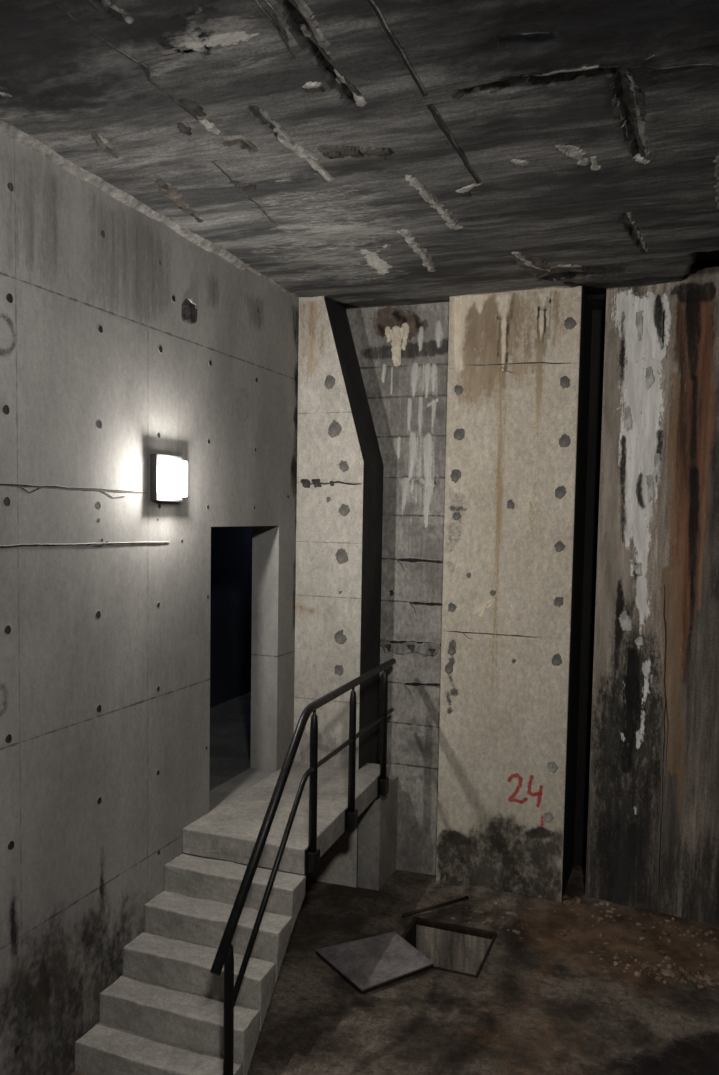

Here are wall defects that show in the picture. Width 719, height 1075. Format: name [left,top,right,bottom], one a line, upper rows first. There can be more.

spalling [276,0,367,107]
crack [212,161,277,225]
spalling [248,105,395,182]
spalling [451,65,651,164]
leakage [364,292,560,527]
crack [0,483,146,499]
crack [0,540,169,549]
peeling [611,288,671,749]
rust [661,282,716,805]
leakage [586,295,719,926]
leakage [447,640,458,713]
leakage [437,817,563,902]